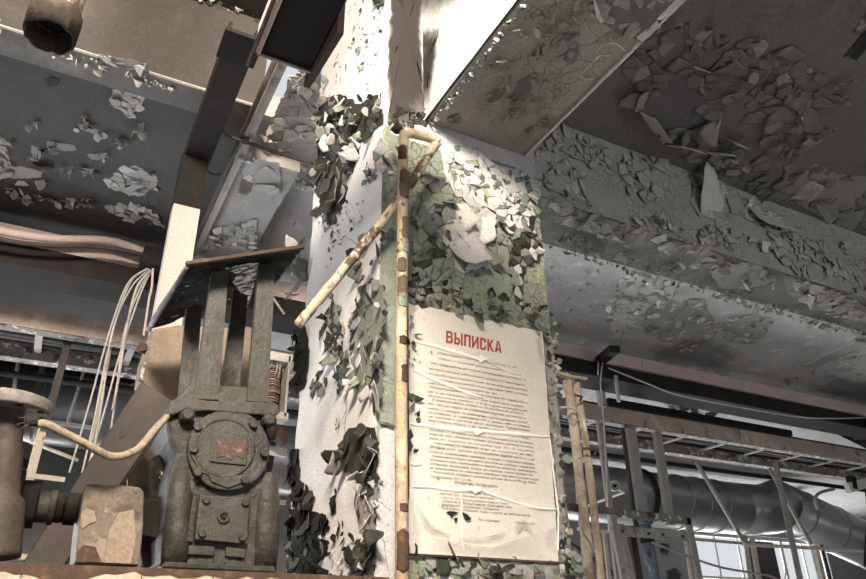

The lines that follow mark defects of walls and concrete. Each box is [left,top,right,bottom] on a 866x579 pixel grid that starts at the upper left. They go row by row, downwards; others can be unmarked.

peeling [0,54,173,228]
crack [580,36,625,81]
peeling [197,219,262,251]
peeling [228,0,866,579]